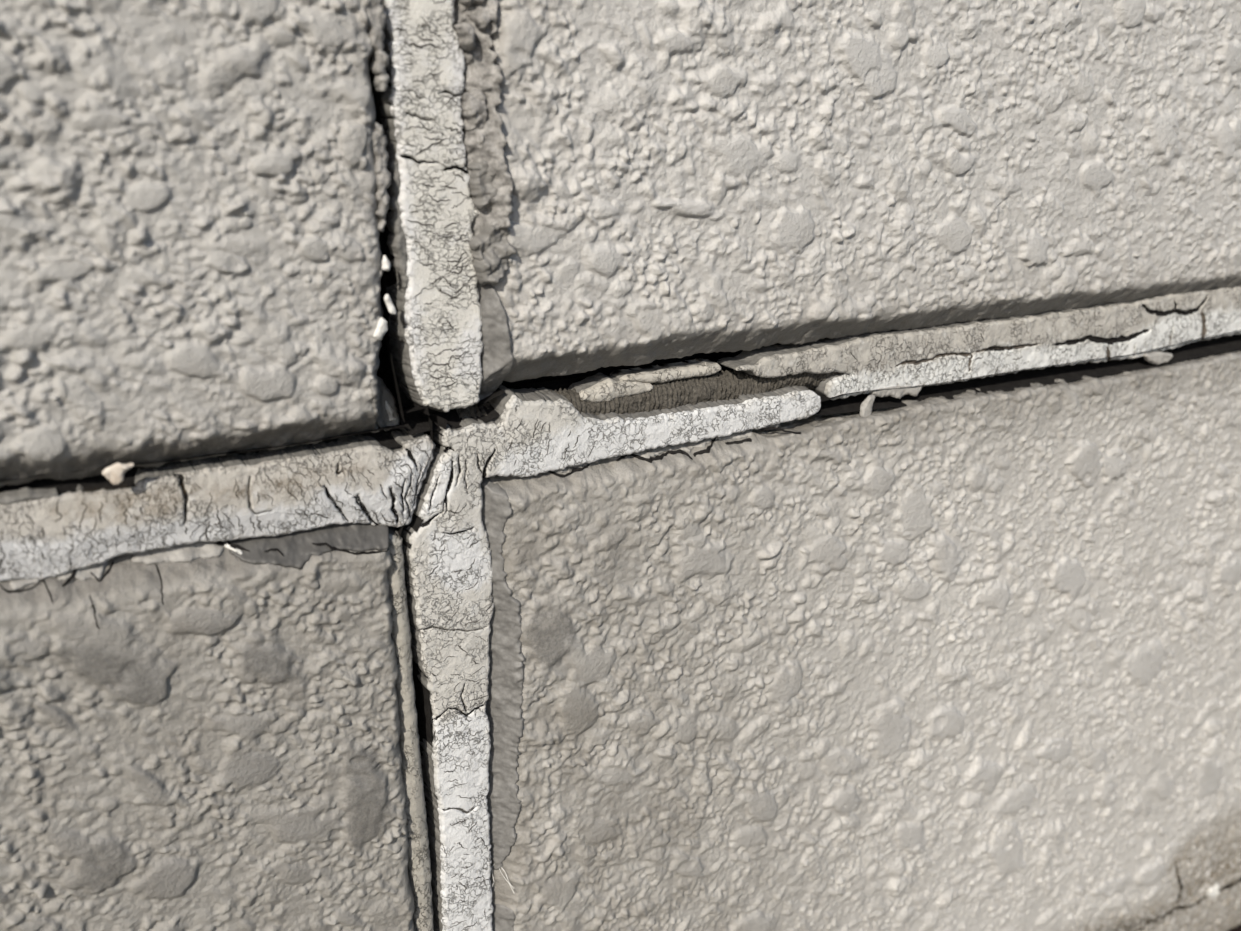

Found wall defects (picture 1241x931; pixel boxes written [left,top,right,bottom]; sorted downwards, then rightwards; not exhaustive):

crack [847,292,1227,385]
crack [0,0,801,931]
peeling [553,424,780,473]